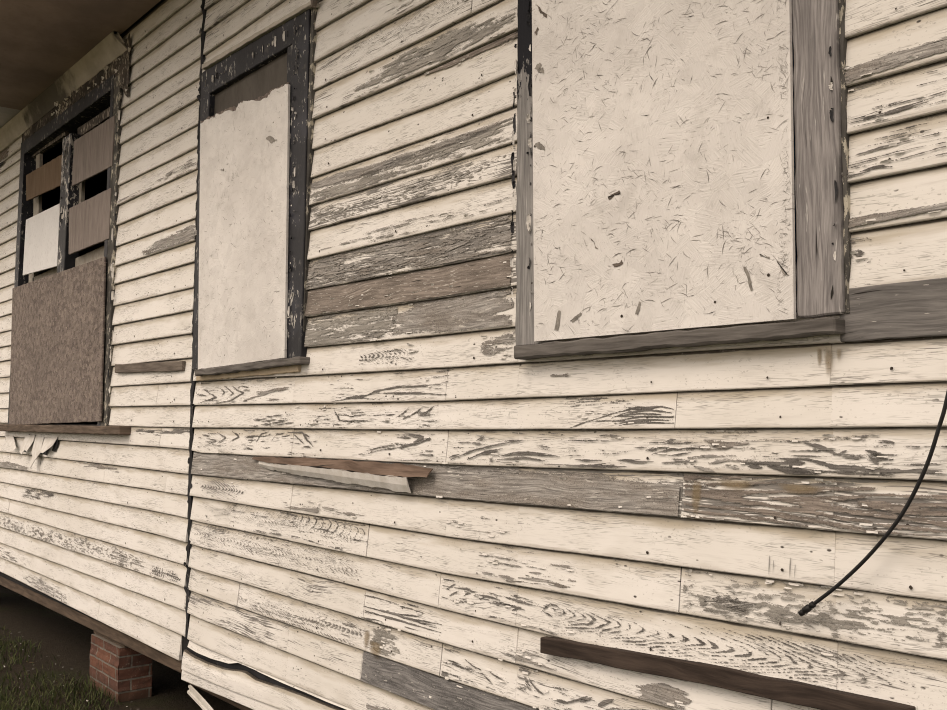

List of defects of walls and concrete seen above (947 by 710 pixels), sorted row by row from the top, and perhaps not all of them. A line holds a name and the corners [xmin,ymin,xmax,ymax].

peeling [51,47,131,116]
peeling [353,12,515,97]
peeling [527,1,547,51]
peeling [308,44,545,251]
peeling [304,249,516,365]
peeling [136,397,947,485]
peeling [108,551,181,582]
peeling [241,590,446,657]
peeling [441,520,941,691]
peeling [441,645,692,710]